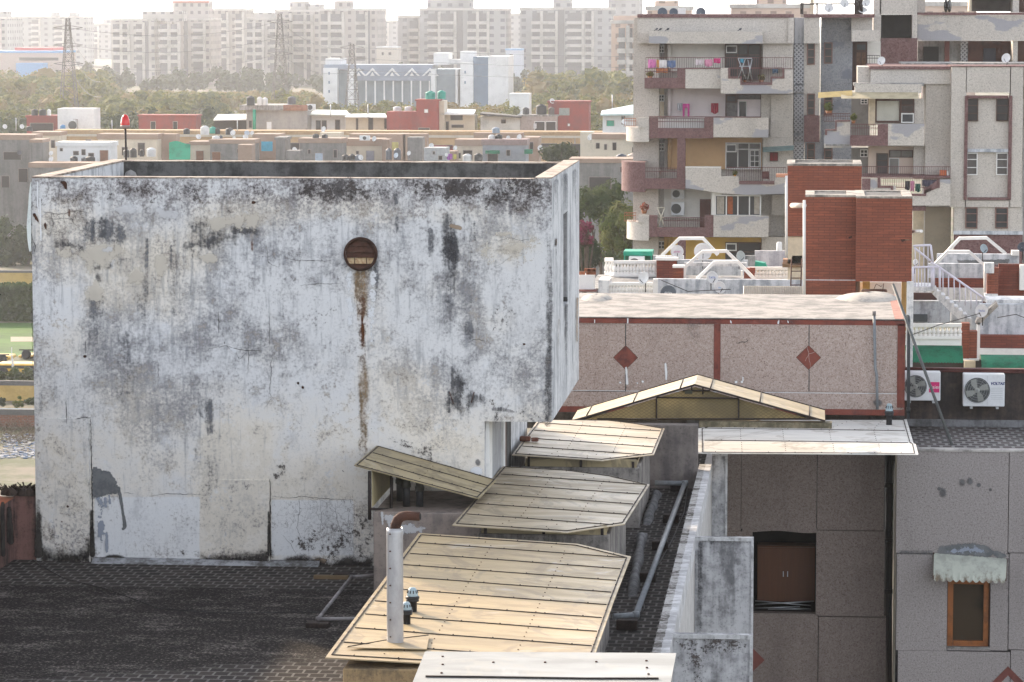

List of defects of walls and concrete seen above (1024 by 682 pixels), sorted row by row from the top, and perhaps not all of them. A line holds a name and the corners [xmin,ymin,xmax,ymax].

leakage [299,177,364,202]
leakage [471,177,542,207]
leakage [55,217,126,252]
leakage [428,214,475,285]
rust [354,270,367,346]
leakage [446,267,578,426]
rust [359,366,368,450]
crack [270,482,350,559]
leakage [286,514,373,566]
leakage [698,541,715,626]
leakage [676,639,746,682]